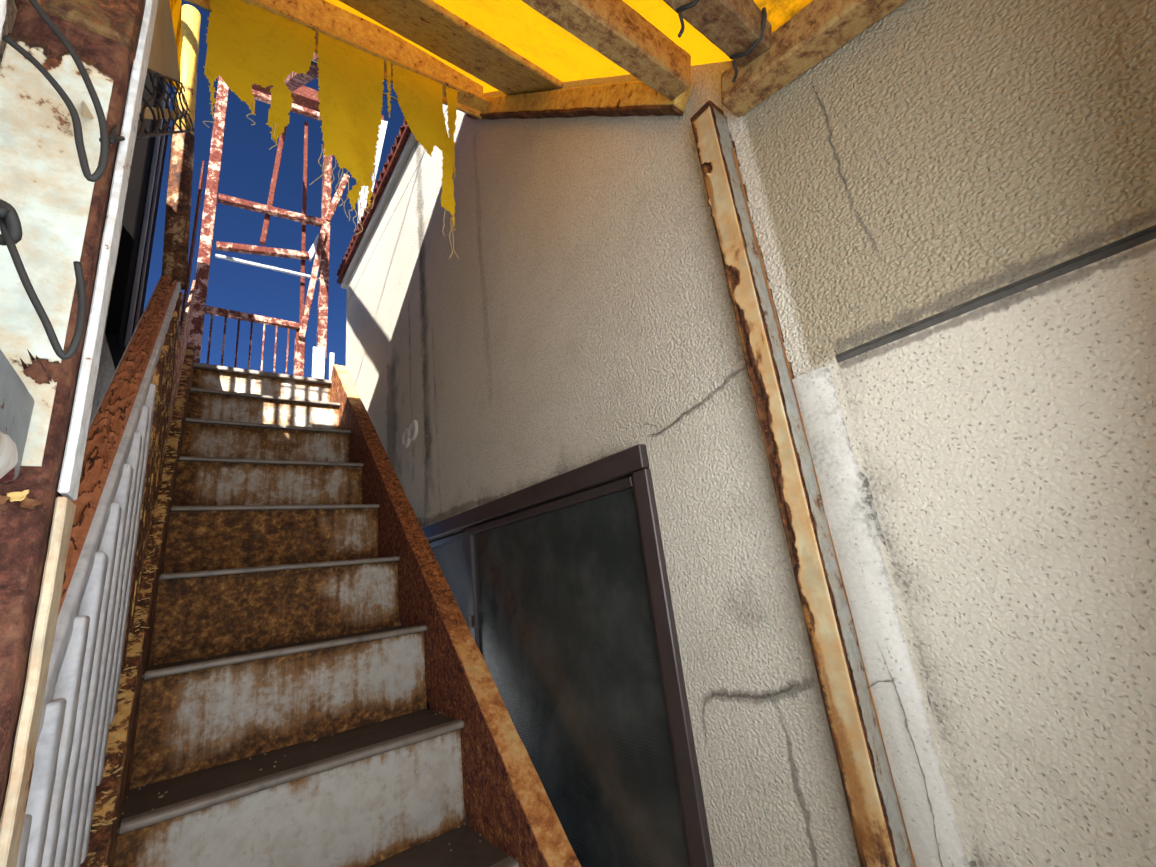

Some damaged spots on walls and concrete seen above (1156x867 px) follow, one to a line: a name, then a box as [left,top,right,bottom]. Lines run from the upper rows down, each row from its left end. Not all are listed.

crack [815,91,845,182]
peeling [0,490,43,509]
corrosion [732,148,916,867]
crack [711,688,791,699]